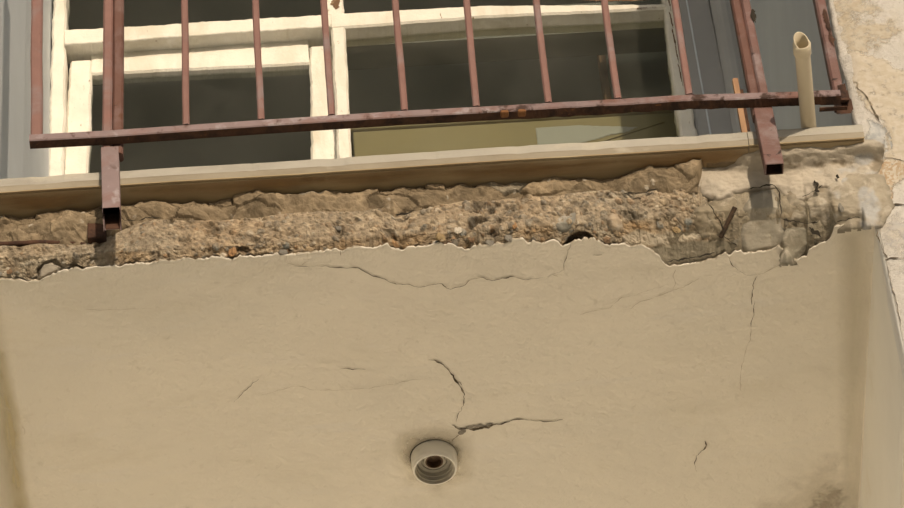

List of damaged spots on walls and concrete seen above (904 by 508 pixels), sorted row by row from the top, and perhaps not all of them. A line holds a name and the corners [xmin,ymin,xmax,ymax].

spalling [0,9,904,281]
crack [286,251,529,290]
crack [729,258,780,379]
crack [341,360,563,441]